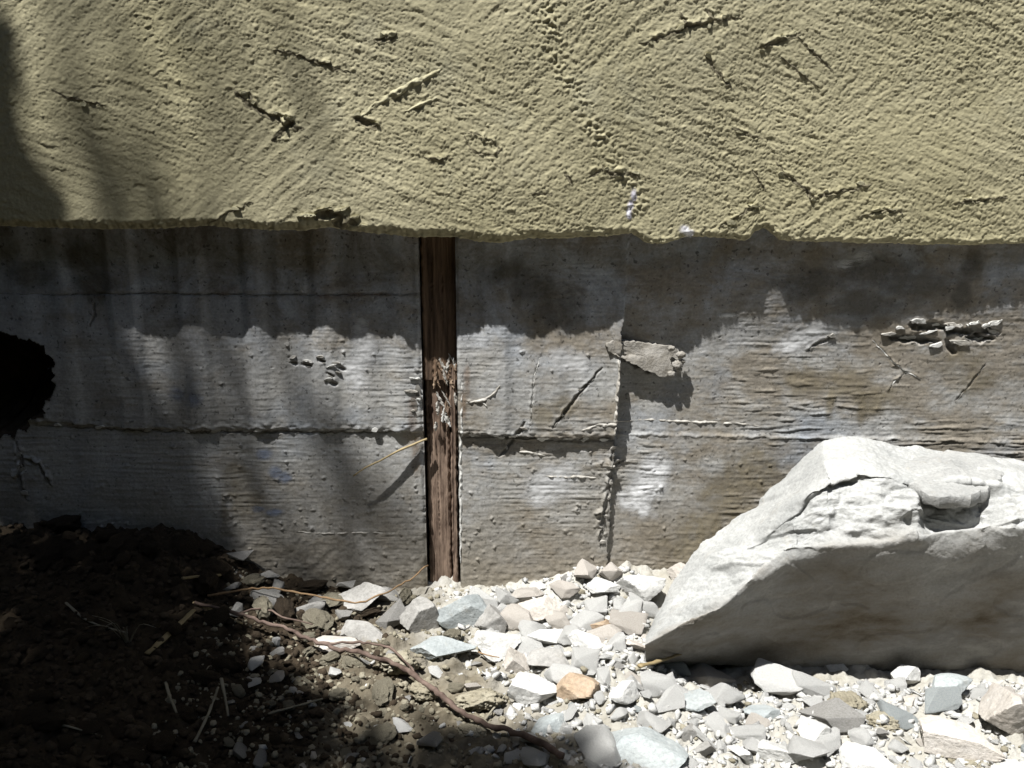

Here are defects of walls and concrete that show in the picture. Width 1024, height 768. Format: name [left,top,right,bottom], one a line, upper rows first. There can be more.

crack [639,8,742,91]
crack [757,32,834,88]
crack [354,117,377,130]
spalling [881,318,1002,352]
spalling [0,331,62,441]
hole [289,355,345,385]
crack [465,353,624,547]